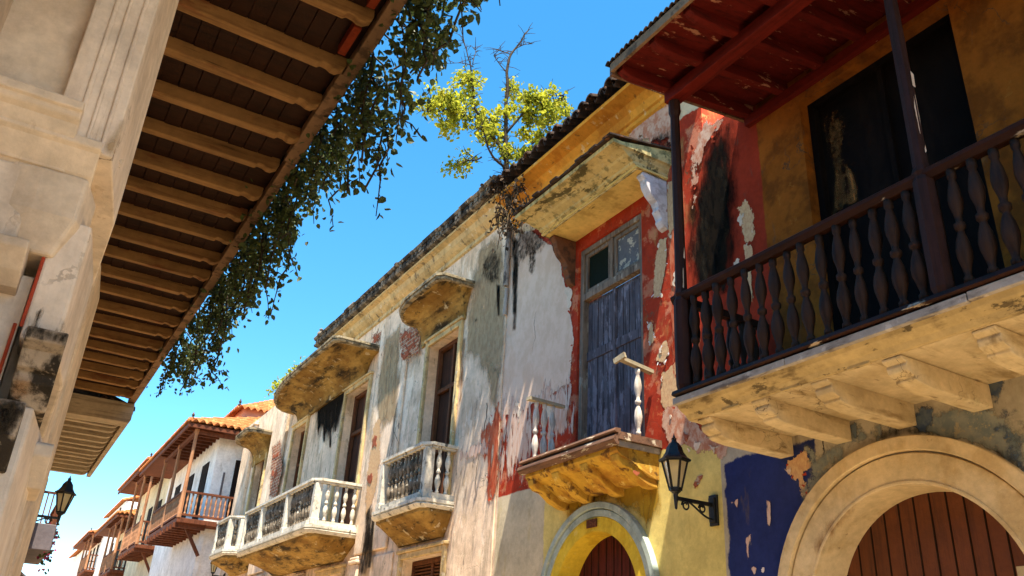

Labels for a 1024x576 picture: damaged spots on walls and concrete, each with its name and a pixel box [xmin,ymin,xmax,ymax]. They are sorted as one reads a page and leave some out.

peeling [688,119,723,209]
leakage [687,127,735,293]
peeling [734,199,755,265]
leakage [316,393,344,447]
spalling [399,327,420,362]
leakage [467,229,544,406]
peeling [460,231,574,502]
peeling [647,165,728,460]
peeling [785,451,811,499]
leakage [801,381,1024,498]